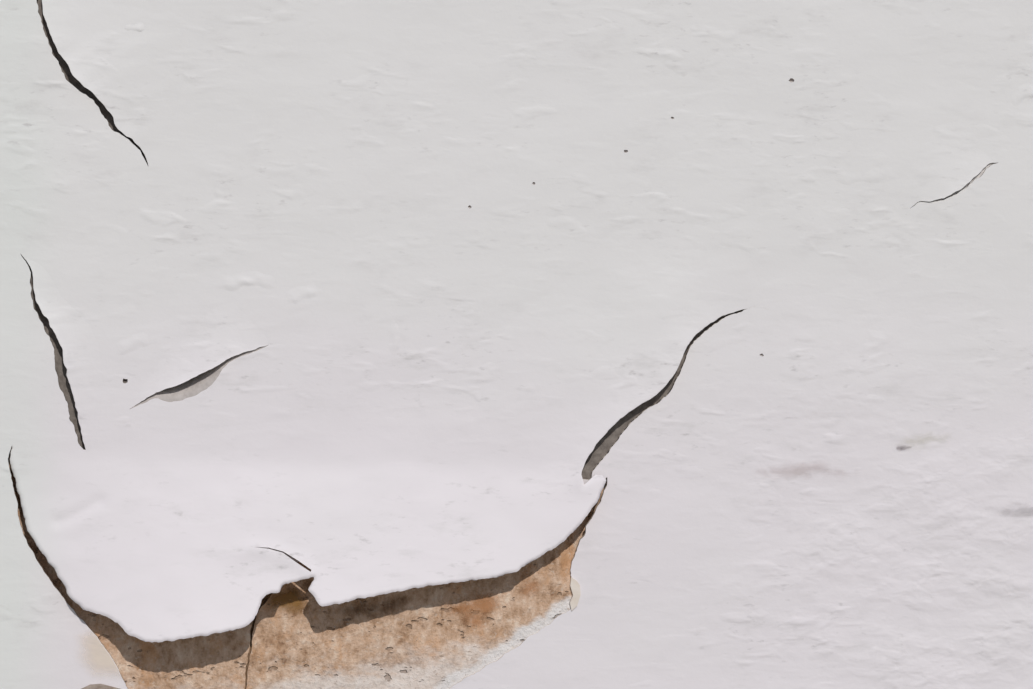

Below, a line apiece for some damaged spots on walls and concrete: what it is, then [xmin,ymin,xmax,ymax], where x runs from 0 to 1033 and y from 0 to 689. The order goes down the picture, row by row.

crack [37,0,184,165]
crack [911,132,996,206]
crack [21,255,102,453]
peeling [8,220,757,689]
crack [581,309,743,479]